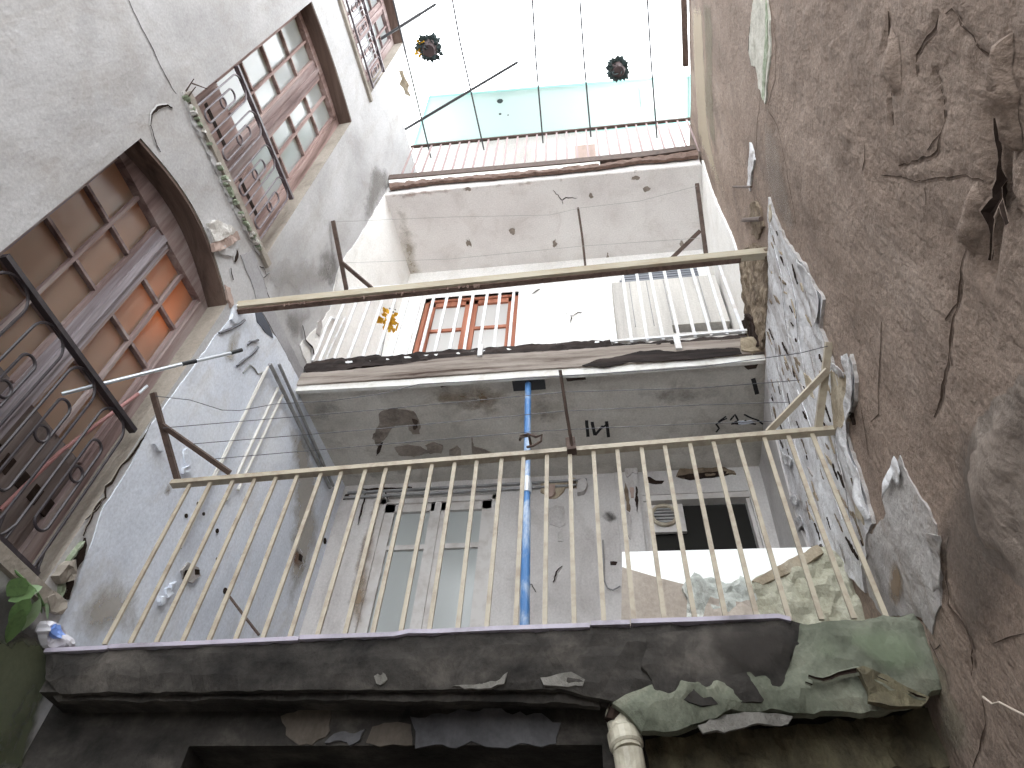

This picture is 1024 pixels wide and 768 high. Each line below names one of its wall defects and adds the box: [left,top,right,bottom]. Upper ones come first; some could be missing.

crack [128,0,176,152]
flaking render [748,0,772,104]
crack [553,190,577,204]
crack [862,8,1010,417]
crack [83,423,151,536]
peeling [372,408,492,457]
peeling [281,708,561,749]
flaking render [453,672,508,690]
flaking render [540,672,585,688]
flaking render [645,666,950,768]